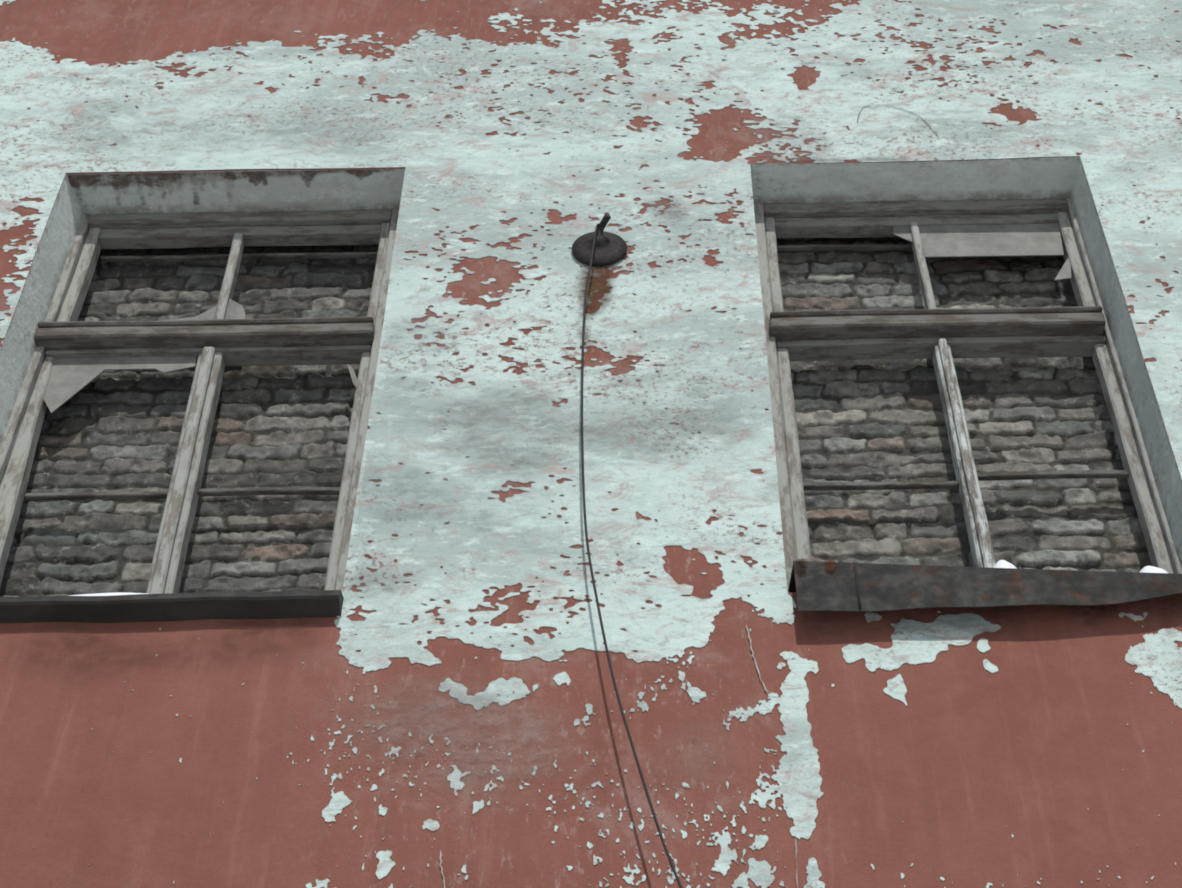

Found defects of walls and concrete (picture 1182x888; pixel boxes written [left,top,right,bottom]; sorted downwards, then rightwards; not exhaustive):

peeling [320,683,522,827]
peeling [519,651,825,888]
peeling [422,806,440,840]
peeling [306,869,339,888]
peeling [351,838,405,888]